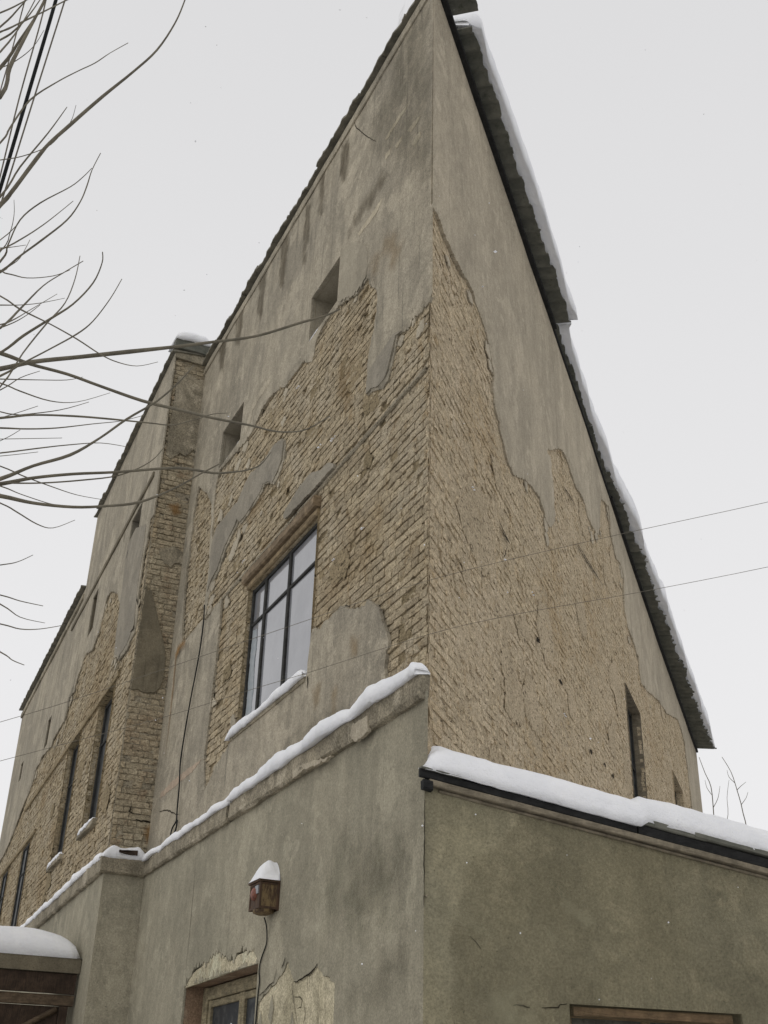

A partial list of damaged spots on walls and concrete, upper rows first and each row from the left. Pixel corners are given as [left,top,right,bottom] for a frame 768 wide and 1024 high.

flaking render [0,199,691,927]
flaking render [185,951,257,988]
flaking render [257,964,335,1024]